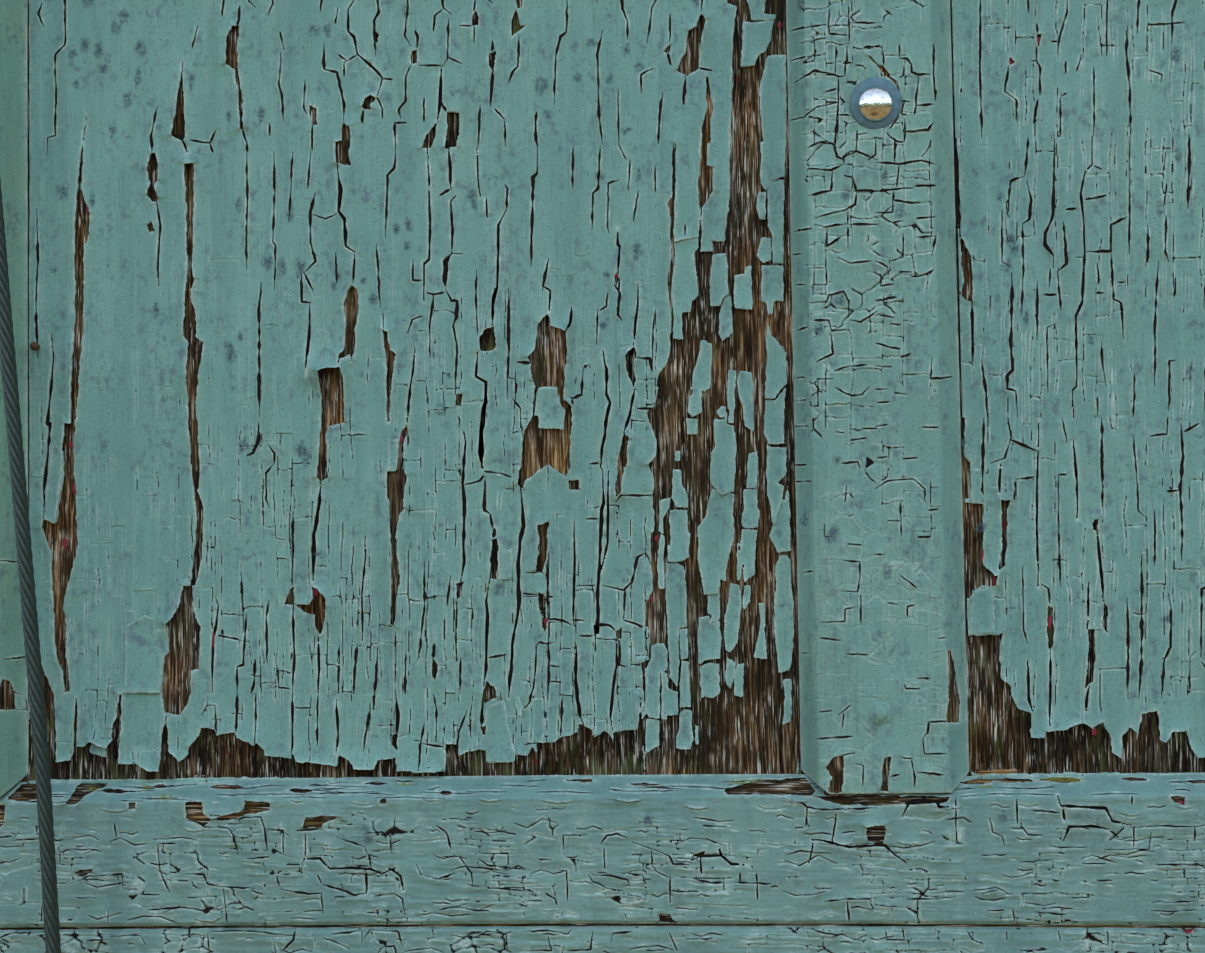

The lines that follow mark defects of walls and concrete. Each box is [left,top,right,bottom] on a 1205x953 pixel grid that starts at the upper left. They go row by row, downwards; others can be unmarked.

crack [37,0,66,156]
crack [149,0,713,771]
peeling [0,0,935,849]
peeling [946,415,1205,808]
crack [67,667,134,763]
peeling [54,829,196,853]
peeling [88,901,255,936]
peeling [338,840,400,876]
peeling [434,855,607,886]
crack [0,705,1205,953]
peeling [975,869,1072,909]
peeling [1050,837,1162,881]